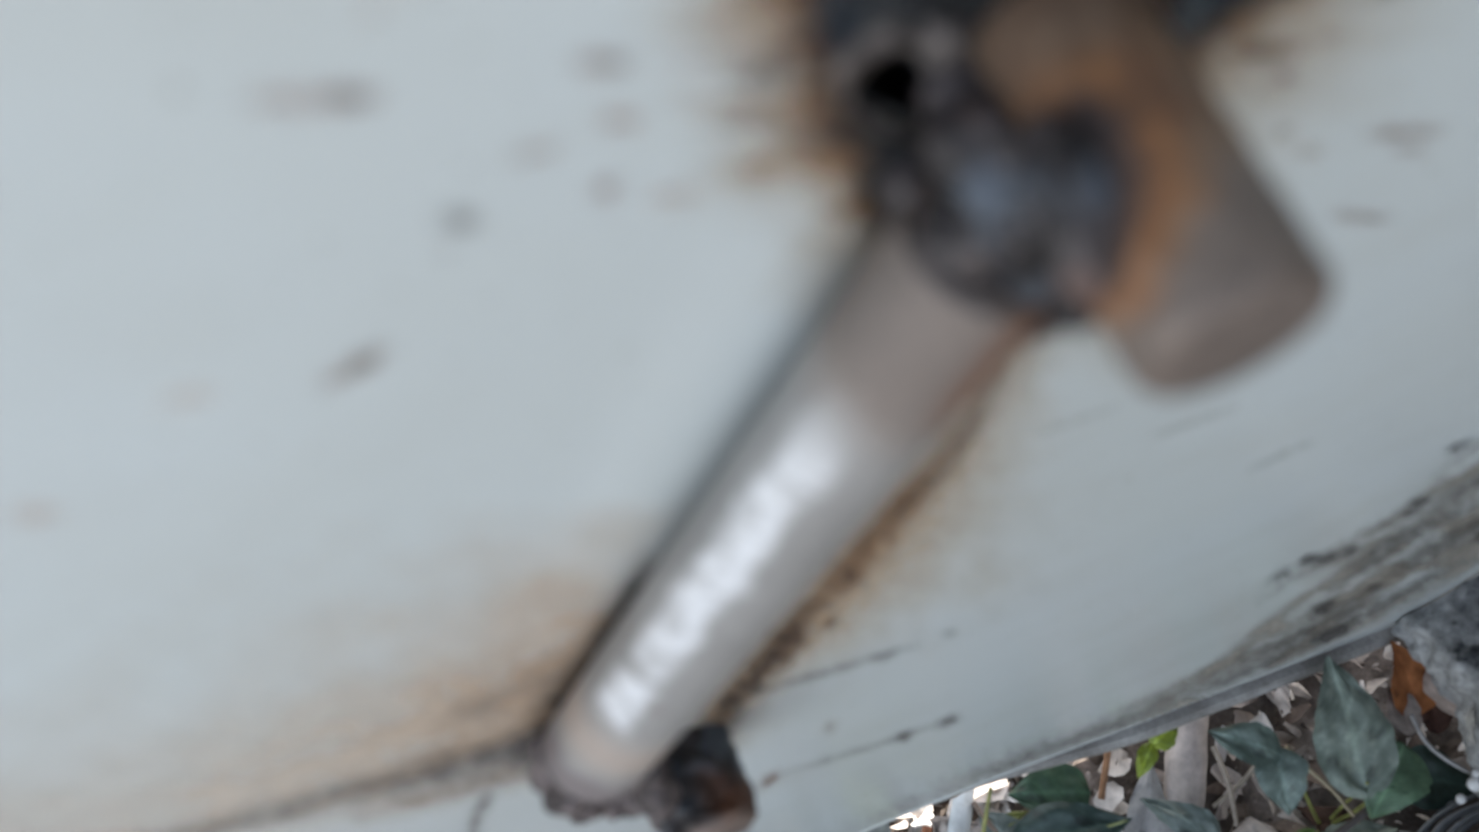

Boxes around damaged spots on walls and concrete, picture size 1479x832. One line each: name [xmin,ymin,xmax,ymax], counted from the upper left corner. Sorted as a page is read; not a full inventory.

water stain [1454,575,1479,626]
water stain [1454,643,1479,670]